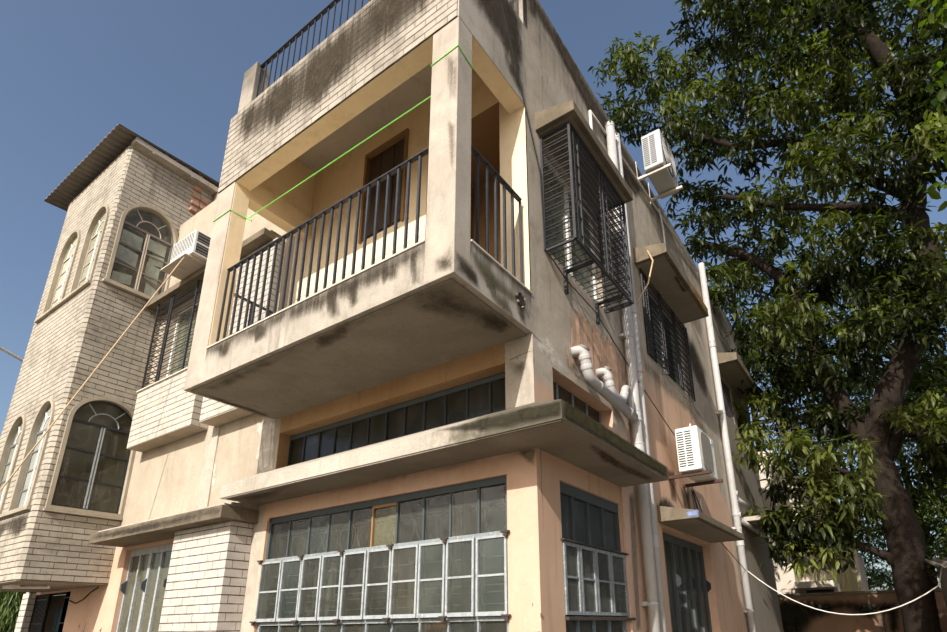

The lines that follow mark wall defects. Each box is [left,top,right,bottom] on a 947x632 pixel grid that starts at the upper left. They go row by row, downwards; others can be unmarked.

leakage [241,0,426,132]
leakage [478,0,523,91]
leakage [529,0,608,139]
leakage [620,143,653,198]
leakage [276,255,416,320]
leakage [459,254,517,311]
leakage [249,326,265,341]
leakage [446,402,690,509]